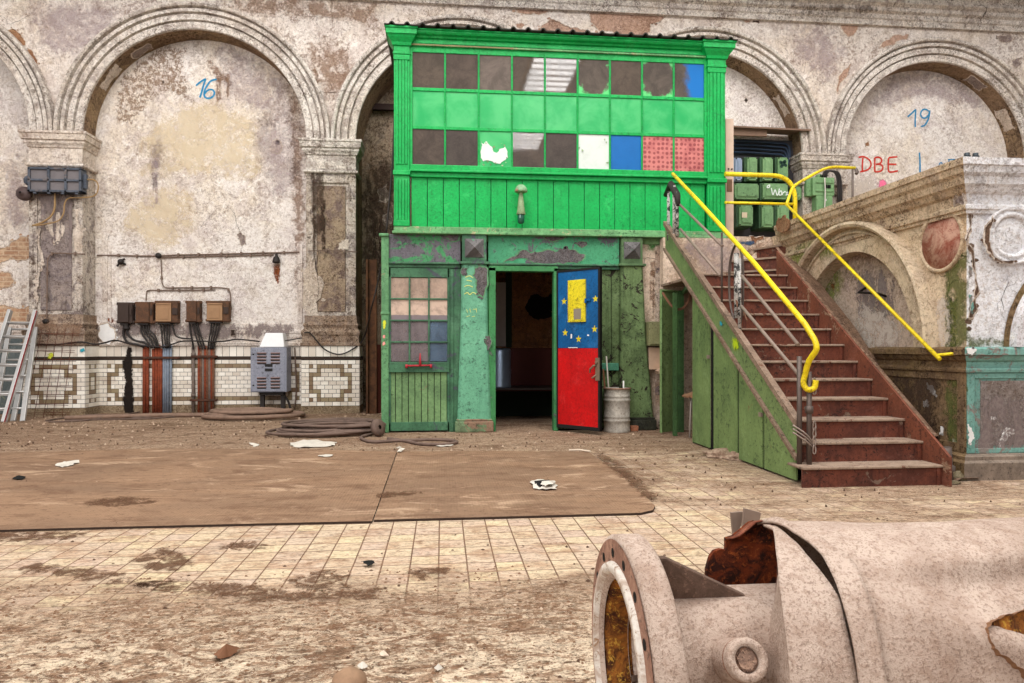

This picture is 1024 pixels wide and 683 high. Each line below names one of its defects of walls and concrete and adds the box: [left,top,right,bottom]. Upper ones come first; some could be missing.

water stain [142,60,261,176]
flaking render [0,208,86,322]
peeling [504,236,587,264]
water stain [936,252,1004,347]
spalling [953,193,1017,331]